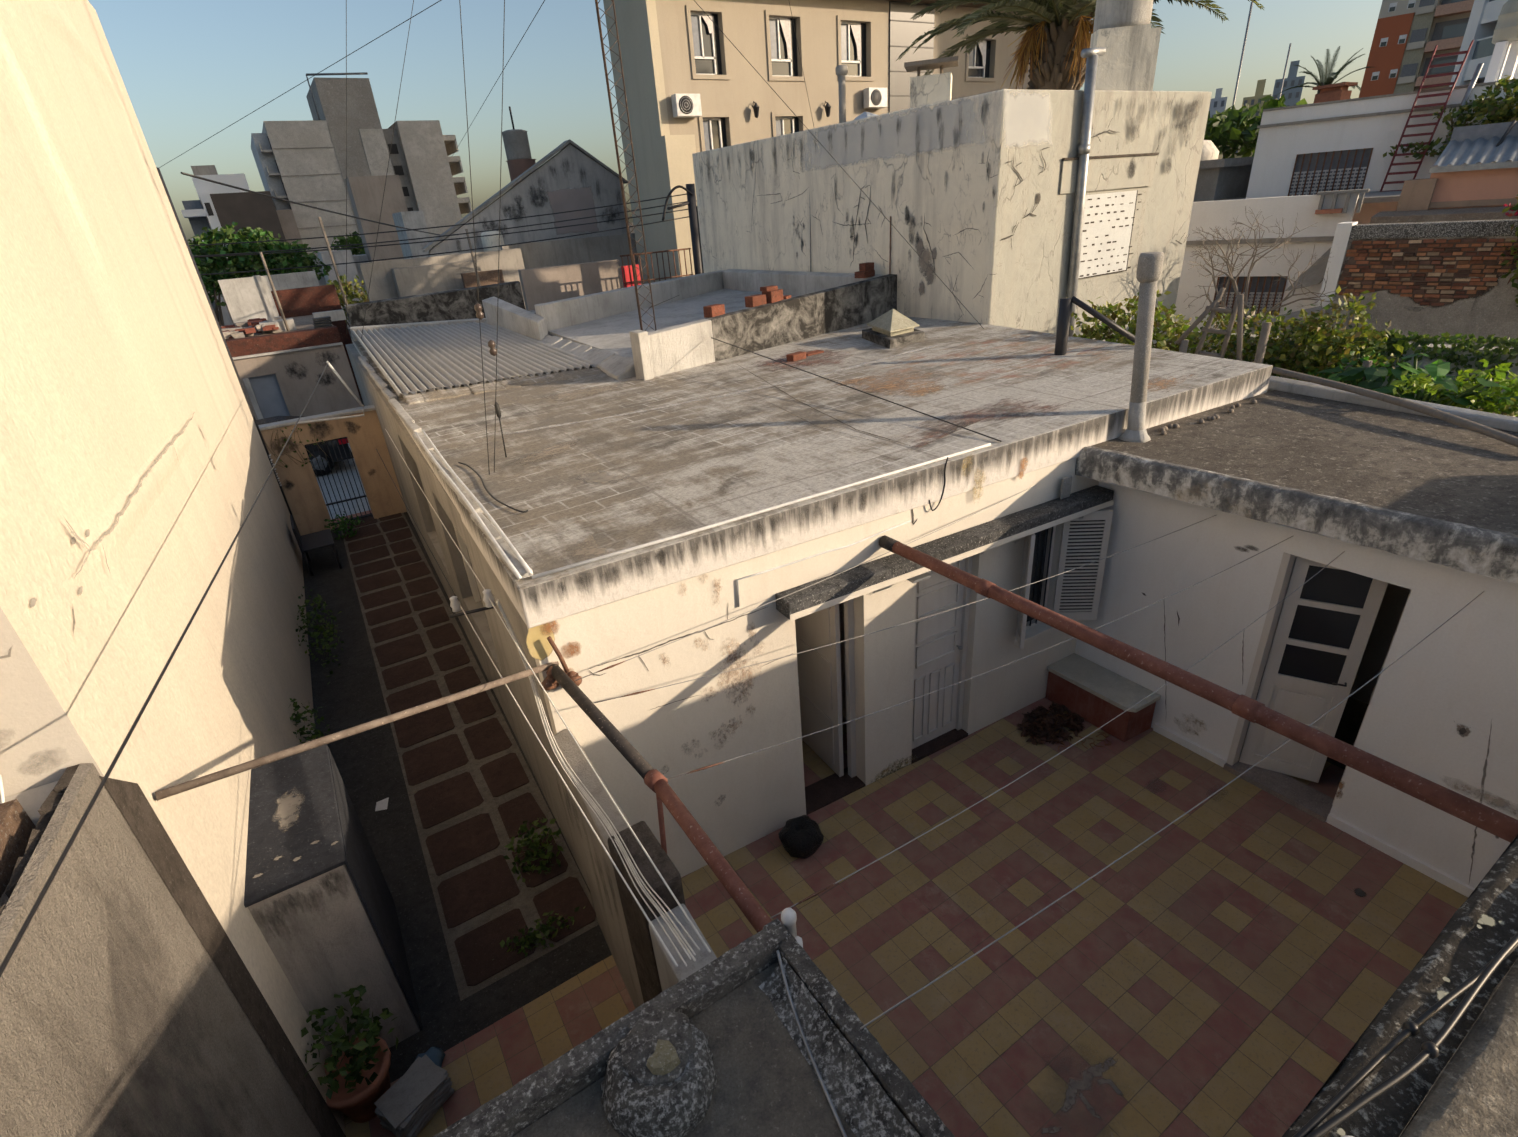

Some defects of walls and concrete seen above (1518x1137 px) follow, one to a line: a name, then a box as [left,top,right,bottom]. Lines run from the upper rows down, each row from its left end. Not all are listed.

crack [66,413,194,631]
crack [1469,730,1491,882]